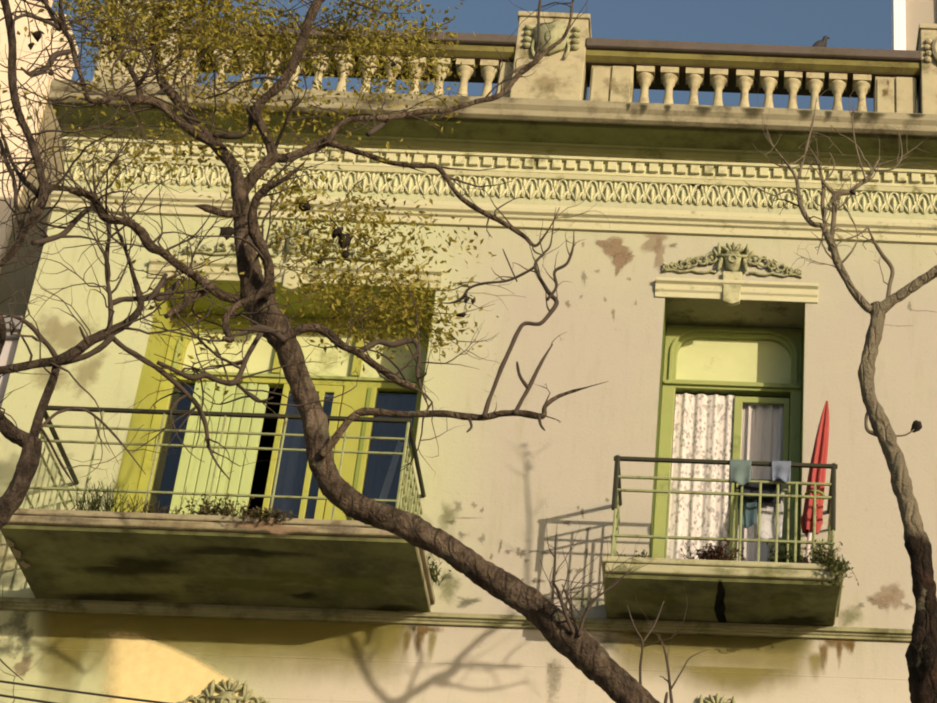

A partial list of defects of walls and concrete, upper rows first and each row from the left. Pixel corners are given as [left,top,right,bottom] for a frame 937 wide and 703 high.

peeling [597,238,633,275]
peeling [644,233,675,264]
water stain [88,558,174,575]
water stain [195,548,287,557]
crack [714,580,726,623]
peeling [871,586,903,608]
rust [404,626,435,648]
rust [811,639,854,669]